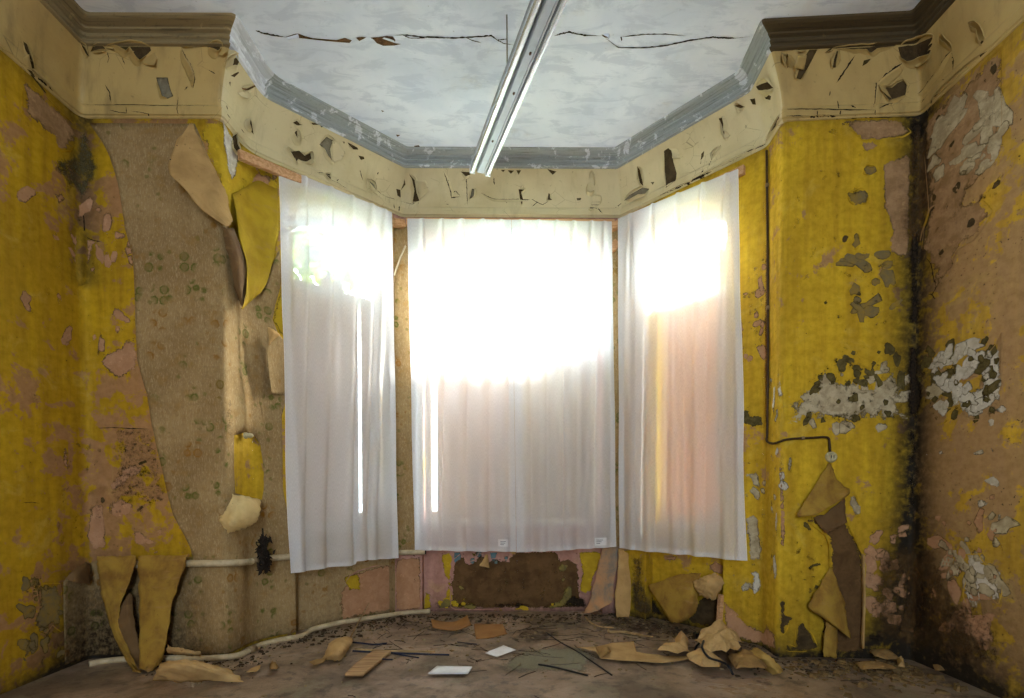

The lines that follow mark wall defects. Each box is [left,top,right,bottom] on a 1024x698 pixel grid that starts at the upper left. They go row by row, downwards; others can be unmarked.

crack [395,34,511,45]
crack [555,31,743,48]
mould [58,134,95,195]
flaking render [202,118,279,259]
peeling [625,148,680,202]
flaking render [836,154,911,325]
flaking render [779,20,1014,287]
flaking render [744,331,1006,436]
mould [907,348,922,416]
flaking render [339,551,600,619]
flaking render [687,494,909,653]
flaking render [926,476,1021,651]